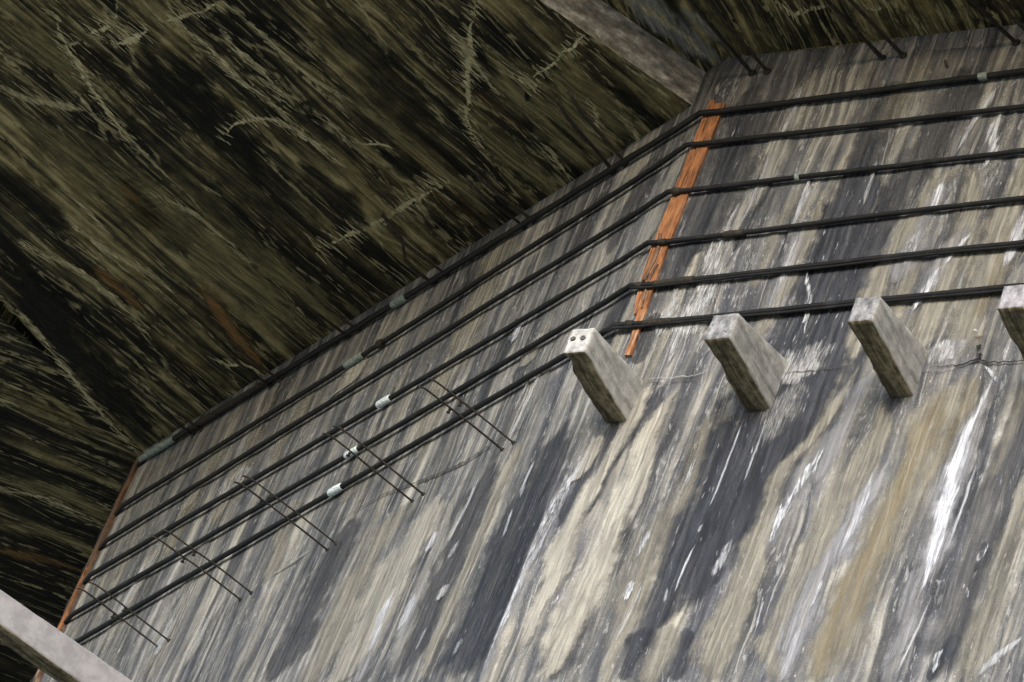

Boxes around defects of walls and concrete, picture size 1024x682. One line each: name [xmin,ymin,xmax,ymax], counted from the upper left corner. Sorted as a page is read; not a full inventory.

damp [265,50,1024,682]
crack [928,344,1024,368]
damp [212,395,276,525]